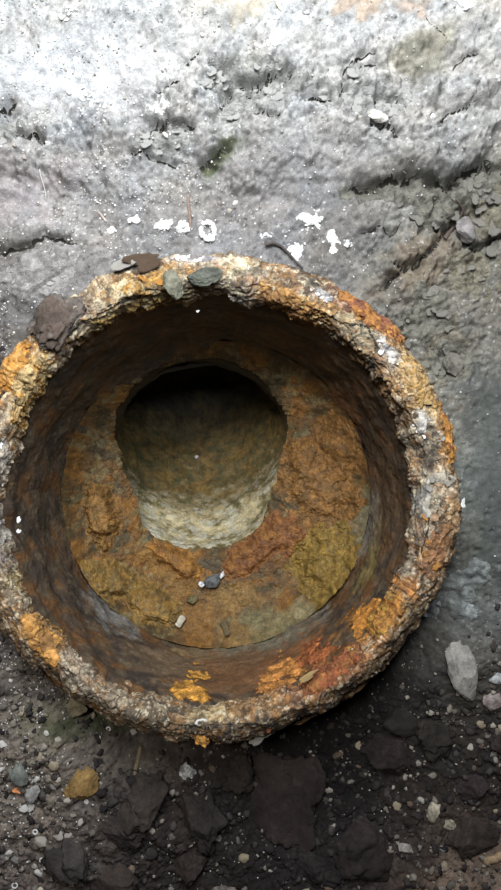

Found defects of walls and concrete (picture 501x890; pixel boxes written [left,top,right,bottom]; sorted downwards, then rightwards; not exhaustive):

efflorescence [153,218,217,242]
efflorescence [287,242,304,261]
efflorescence [296,209,353,254]
corrosion [84,252,180,331]
corrosion [260,283,321,327]
corrosion [0,339,56,435]
corrosion [338,289,457,463]
corrosion [139,406,368,582]
corrosion [18,606,68,668]
corrosion [252,574,420,697]
corrosion [169,662,212,704]
corrosion [249,728,275,746]